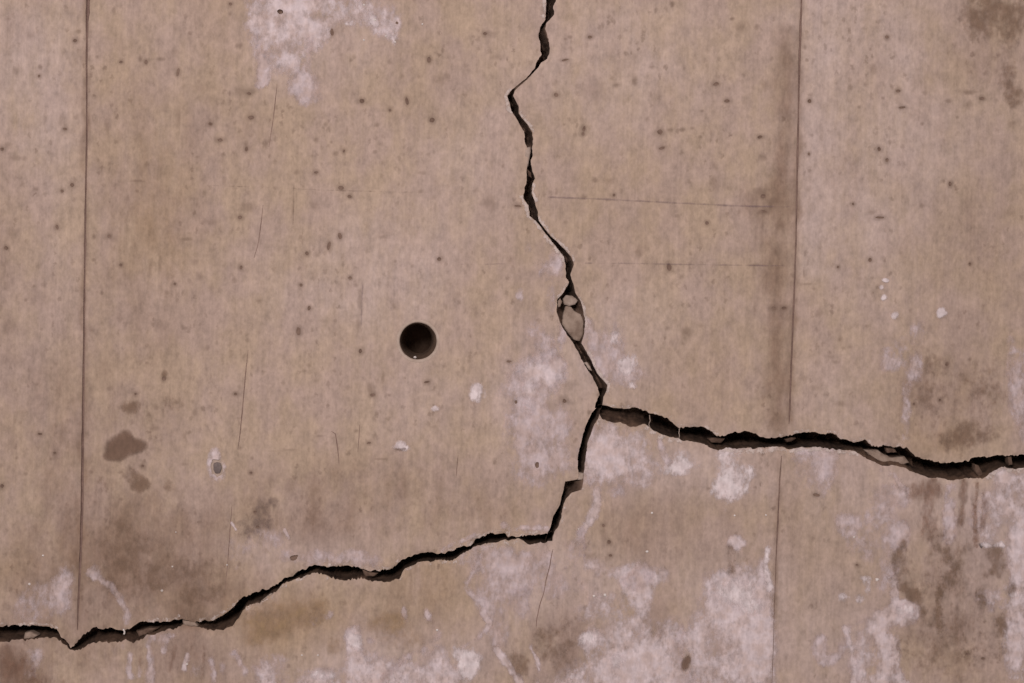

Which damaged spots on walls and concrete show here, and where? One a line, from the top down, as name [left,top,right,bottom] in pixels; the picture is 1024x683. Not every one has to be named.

crack [504,0,1024,481]
leakage [104,431,145,460]
crack [238,354,248,448]
crack [0,406,601,651]
leakage [943,484,957,552]
leakage [972,469,1024,680]